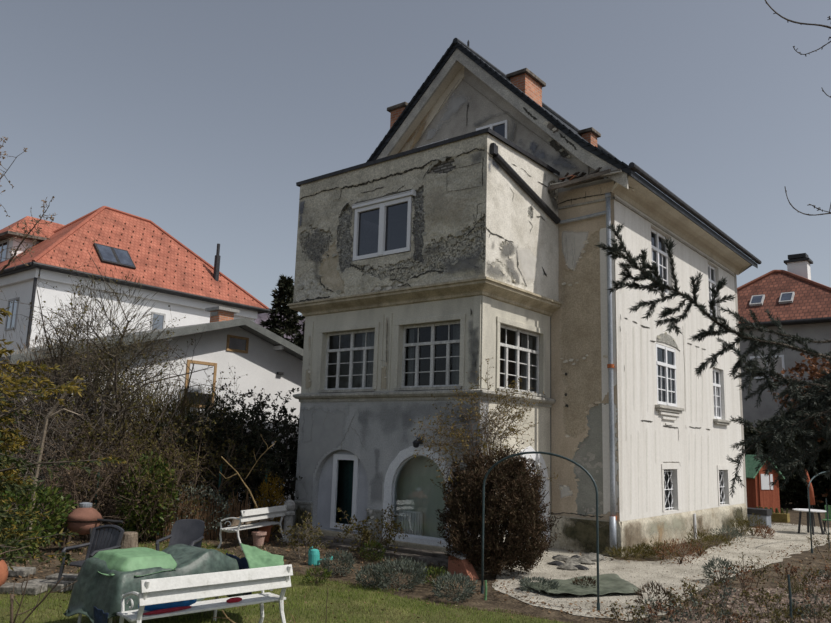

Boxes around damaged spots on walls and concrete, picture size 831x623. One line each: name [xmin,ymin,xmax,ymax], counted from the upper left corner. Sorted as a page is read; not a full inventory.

flaking render [295,185,537,301]
flaking render [427,157,456,174]
crack [299,148,612,287]
flaking render [559,226,619,516]